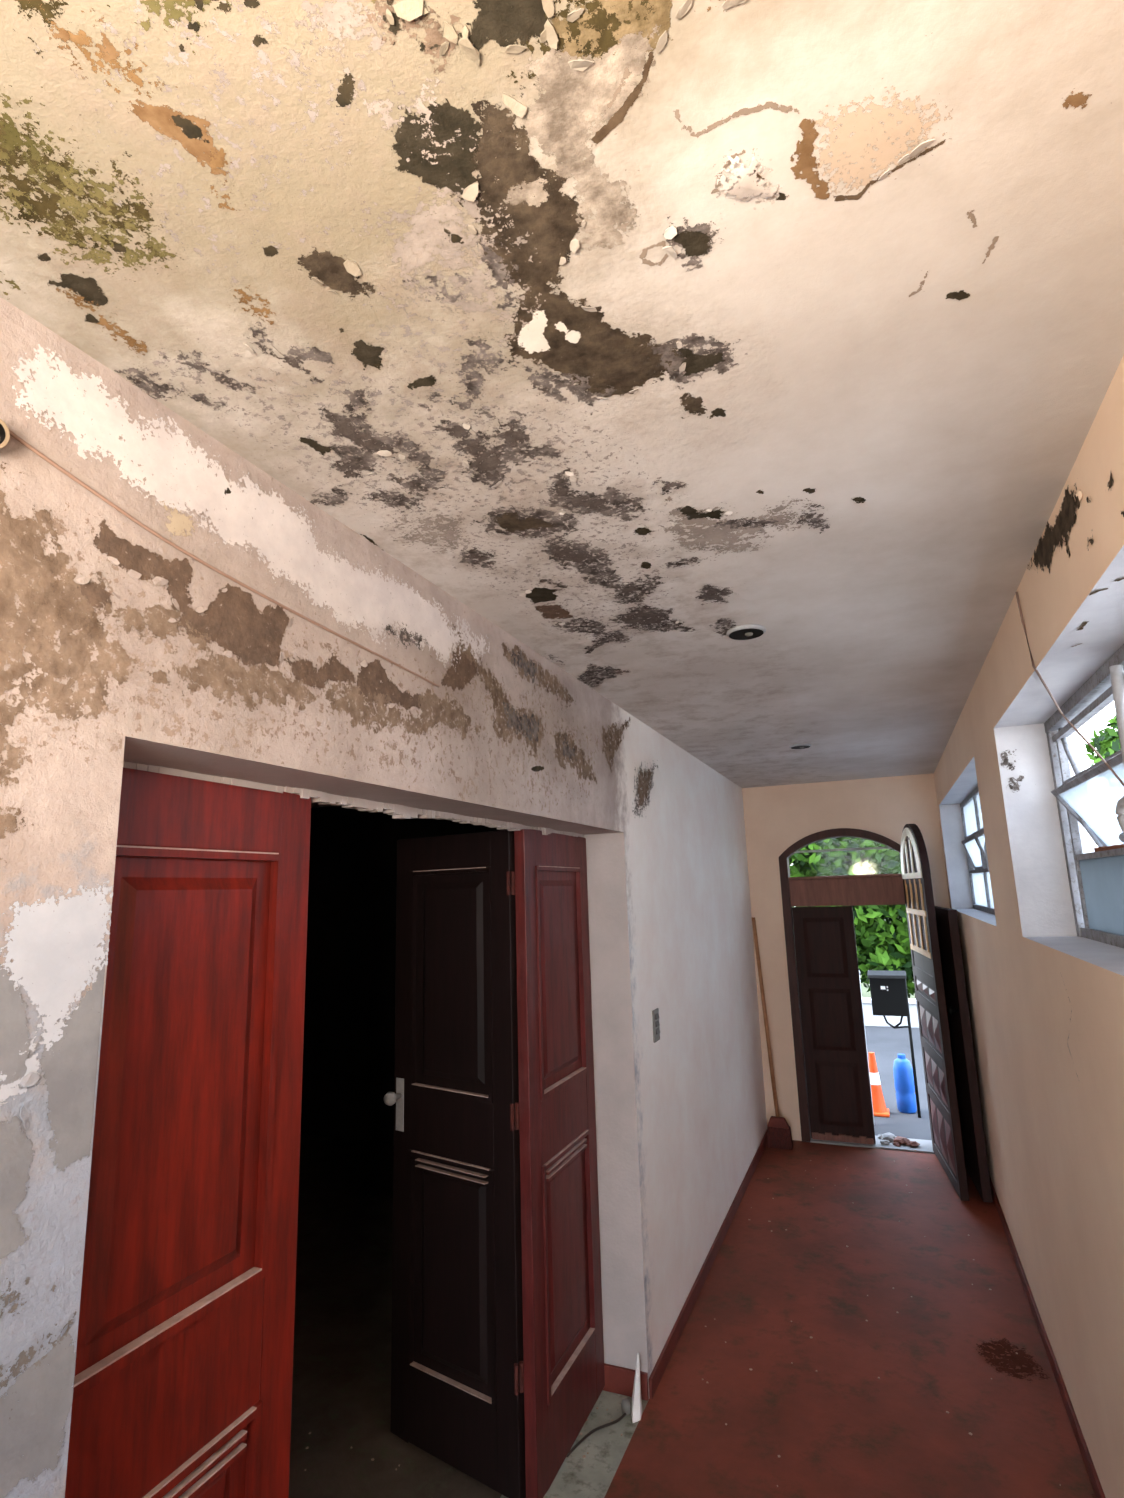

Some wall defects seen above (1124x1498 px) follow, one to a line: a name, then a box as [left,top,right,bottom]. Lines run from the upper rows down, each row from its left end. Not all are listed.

peeling [674,78,952,202]
leakage [0,0,680,647]
peeling [0,0,830,838]
spalling [1027,483,1093,574]
leakage [0,462,68,787]
leakage [0,806,34,839]
peeling [0,880,113,1259]
peeling [0,1277,30,1318]
peeling [0,1311,77,1498]